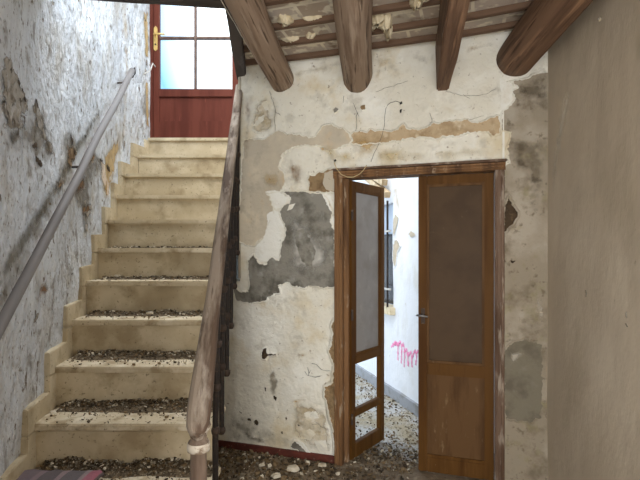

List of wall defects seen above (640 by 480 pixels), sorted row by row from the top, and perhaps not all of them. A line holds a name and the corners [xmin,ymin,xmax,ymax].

peeling [409,0,429,11]
peeling [277,14,294,28]
peeling [281,32,316,43]
peeling [372,14,393,41]
flaking render [2,54,53,152]
damp [518,142,540,181]
flaking render [233,72,548,480]